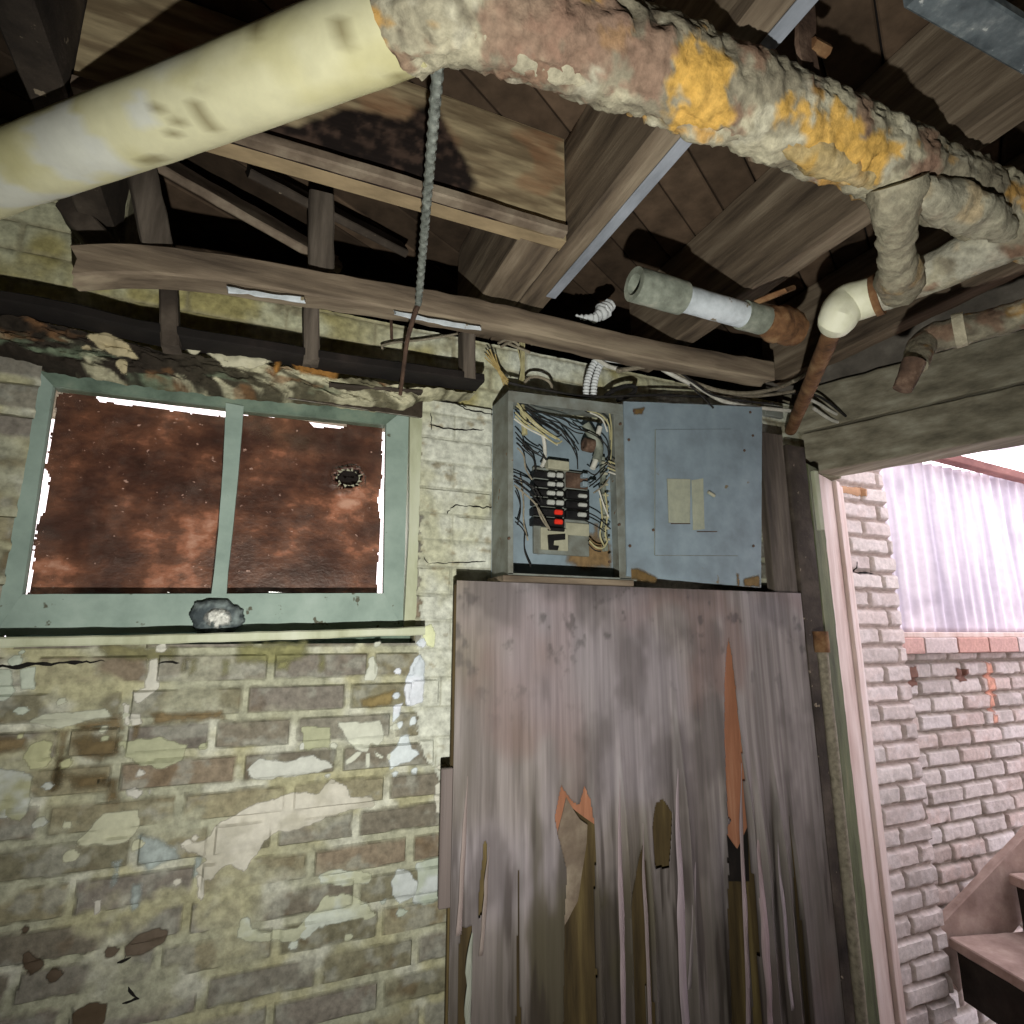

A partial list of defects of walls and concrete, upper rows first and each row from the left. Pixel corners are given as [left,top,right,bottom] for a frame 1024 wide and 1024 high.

peeling [82,333,138,373]
peeling [187,349,271,369]
crack [447,504,492,514]
crack [0,660,104,670]
peeling [0,624,435,900]
peeling [237,857,439,950]
spalling [105,928,168,958]
spalling [22,951,64,983]
spalling [72,1002,107,1024]